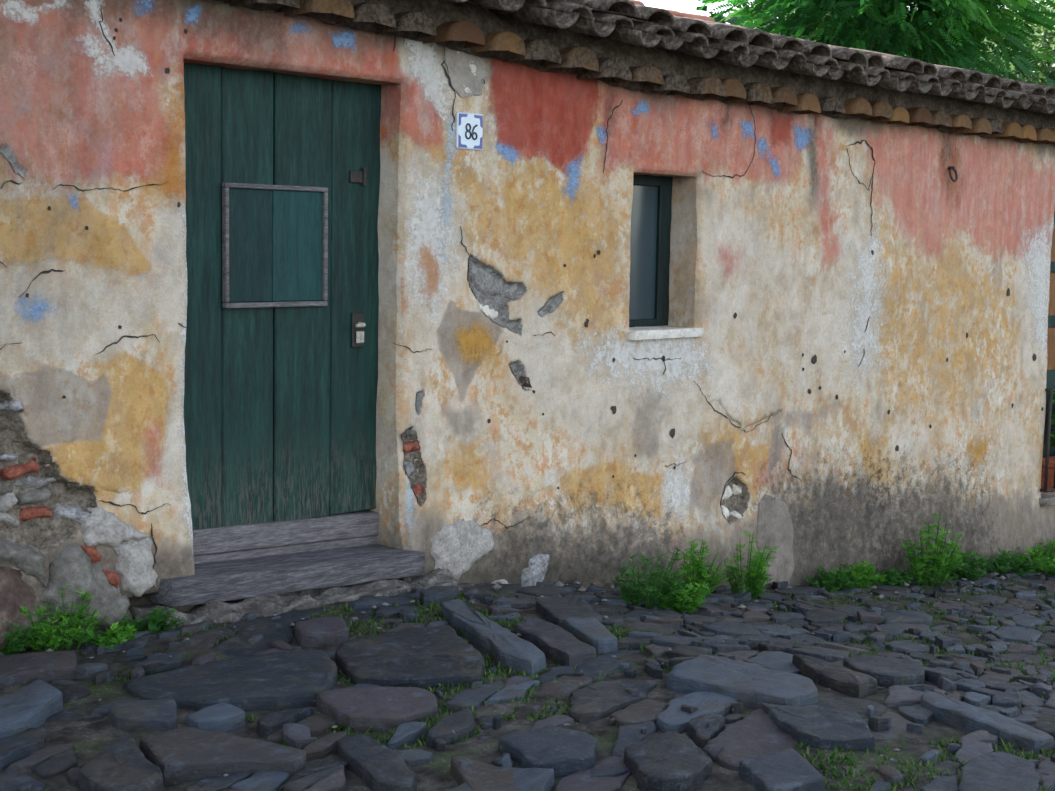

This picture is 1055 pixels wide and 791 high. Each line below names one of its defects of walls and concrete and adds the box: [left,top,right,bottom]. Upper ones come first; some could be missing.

flaking render [404,38,528,356]
crack [847,140,875,236]
crack [19,269,63,297]
flaking render [0,390,97,556]
crack [95,334,160,355]
crack [100,500,170,570]
flaking render [181,302,193,542]
spalling [401,426,427,525]
spalling [509,360,535,393]
spalling [720,475,751,524]
crack [694,382,801,480]
damp [771,437,988,585]